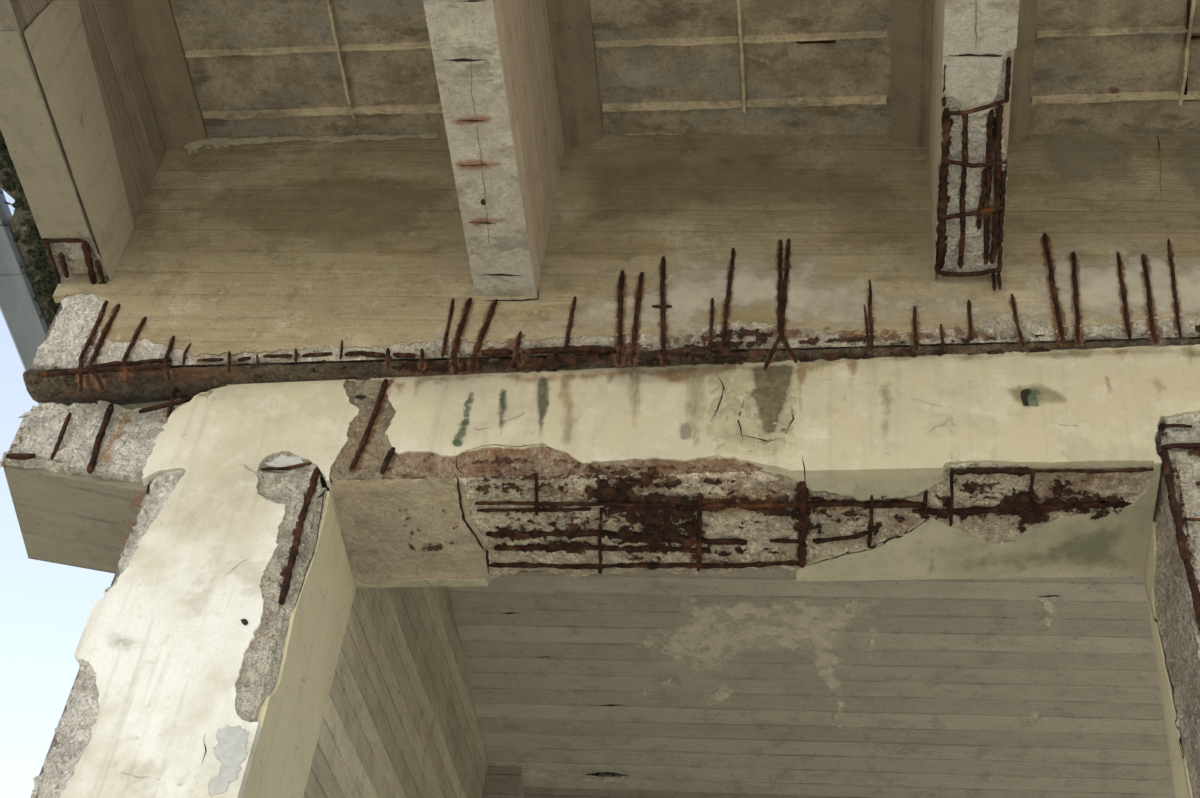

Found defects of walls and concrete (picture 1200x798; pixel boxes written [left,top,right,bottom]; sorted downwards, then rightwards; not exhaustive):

corrosion [457,161,498,169]
water stain [538,378,549,425]
corrosion [23,325,1200,403]
water stain [681,425,691,439]
water stain [752,363,823,432]
spalling [0,233,1200,798]